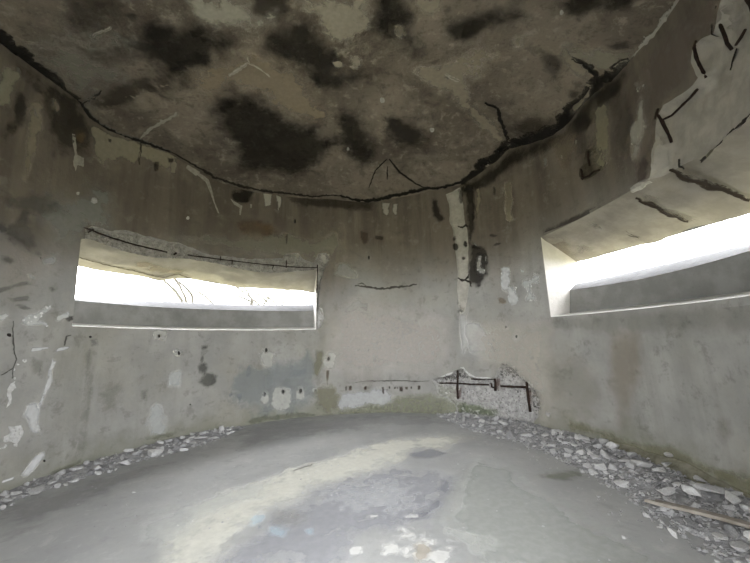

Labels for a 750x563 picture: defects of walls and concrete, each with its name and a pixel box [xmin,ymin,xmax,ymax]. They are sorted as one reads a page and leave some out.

damp [306,0,418,55]
damp [449,13,518,39]
spalling [718,23,747,51]
damp [125,0,374,174]
crack [0,29,629,203]
spalling [630,89,750,223]
crack [355,282,417,290]
spalling [446,188,485,315]
damp [468,245,488,287]
crack [1,321,17,378]
peeling [0,359,55,449]
spalling [432,364,541,423]